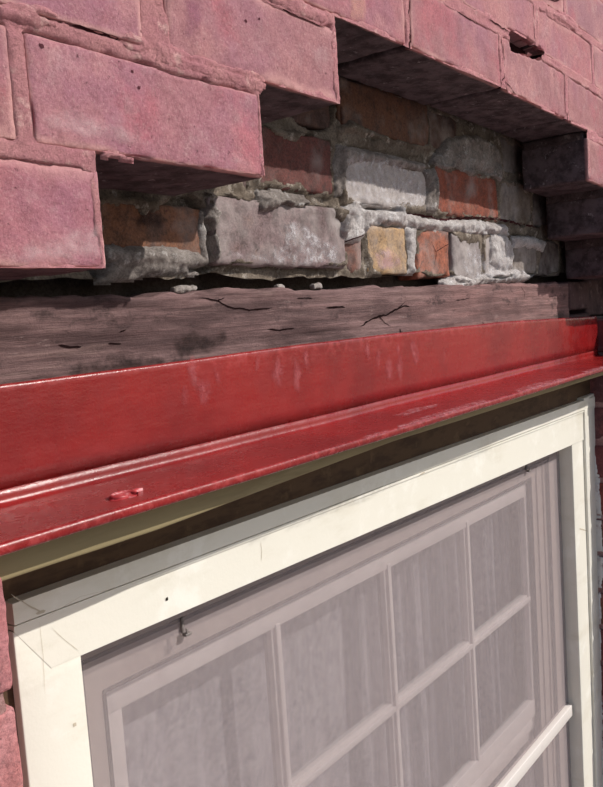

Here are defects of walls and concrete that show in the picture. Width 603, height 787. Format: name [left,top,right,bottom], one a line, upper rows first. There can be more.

peeling [509,42,527,55]
spalling [22,75,603,318]
crack [205,298,273,311]
crack [361,302,410,333]
damp [178,335,225,354]